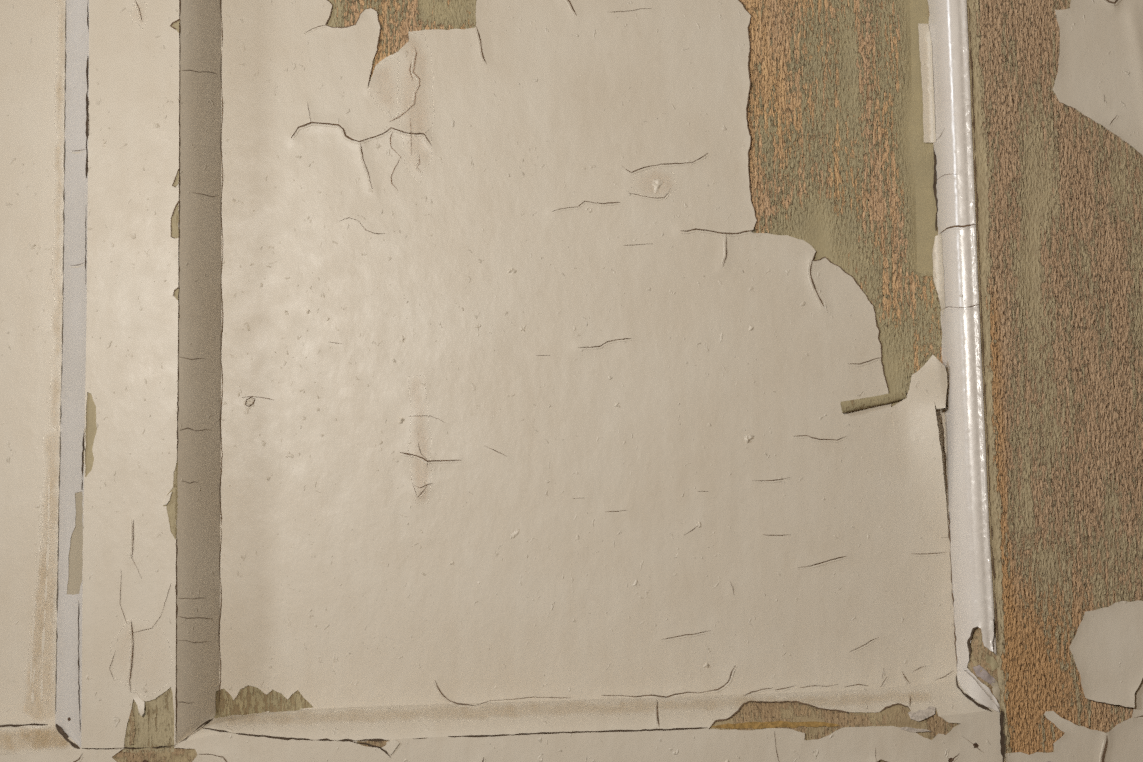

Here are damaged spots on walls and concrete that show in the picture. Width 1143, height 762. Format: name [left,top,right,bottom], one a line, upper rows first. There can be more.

peeling [325,0,477,89]
crack [291,47,430,189]
crack [554,154,709,213]
crack [684,228,753,265]
crack [807,260,824,307]
peeling [738,0,948,538]
peeling [958,0,1143,762]
crack [399,444,459,498]
crack [109,520,211,687]
peeling [112,687,197,762]
peeling [214,685,313,718]
peeling [709,700,961,740]